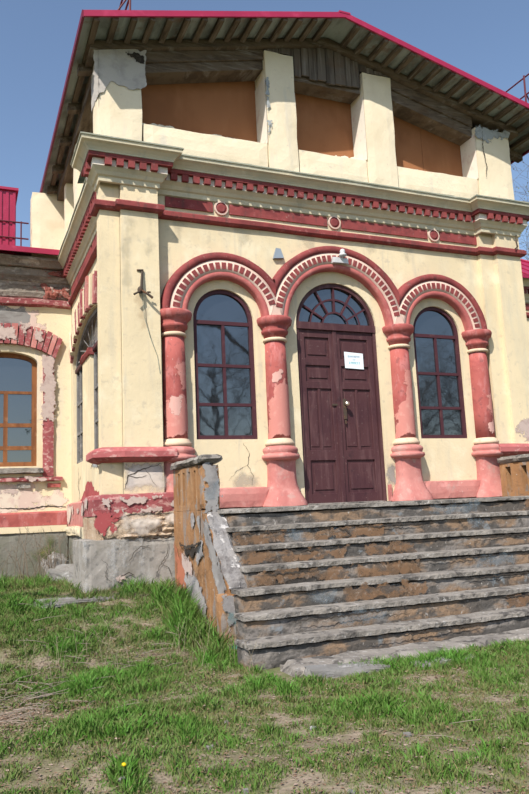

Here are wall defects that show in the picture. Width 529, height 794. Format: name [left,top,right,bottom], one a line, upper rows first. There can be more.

spalling [125,52,145,64]
flaking render [0,306,47,342]
peeling [40,354,57,426]
peeling [164,394,188,439]
peeling [268,369,291,439]
peeling [394,369,416,439]
spalling [0,476,174,540]
crack [117,511,171,519]
crack [124,536,174,576]
spalling [180,462,238,626]